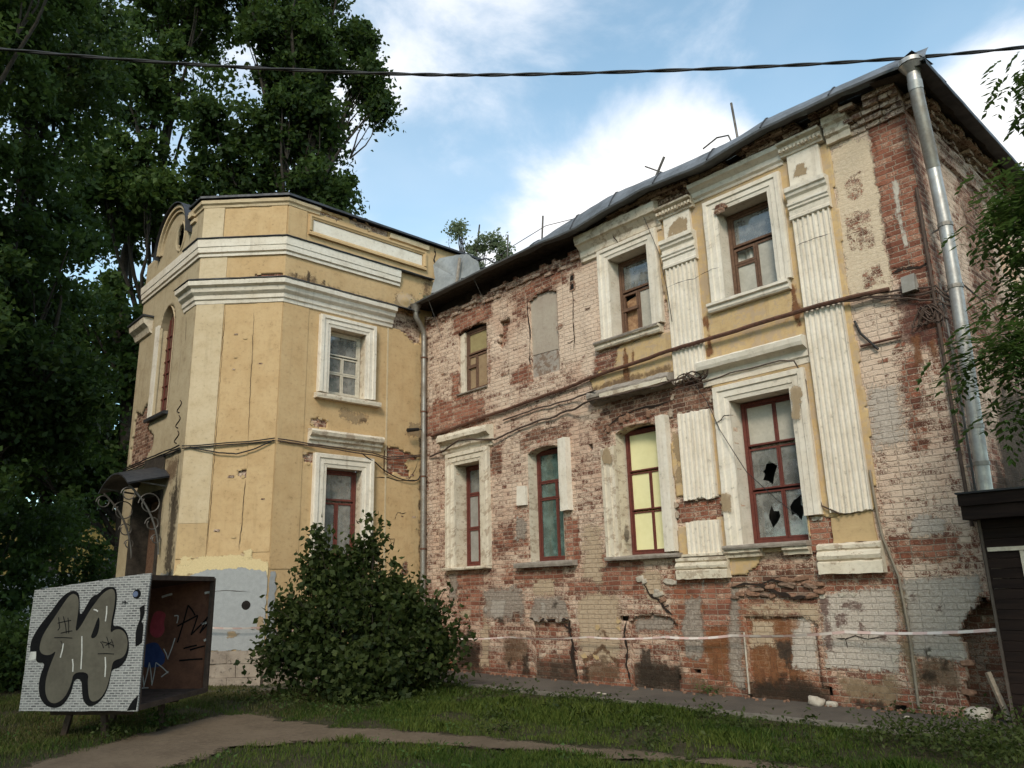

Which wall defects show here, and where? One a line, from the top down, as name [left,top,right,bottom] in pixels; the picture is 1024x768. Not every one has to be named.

flaking render [868,114,931,269]
spalling [131,407,154,468]
peeling [173,549,268,576]
crack [643,584,672,615]
peeling [508,516,983,675]
crack [622,621,631,683]
water stain [636,649,727,695]